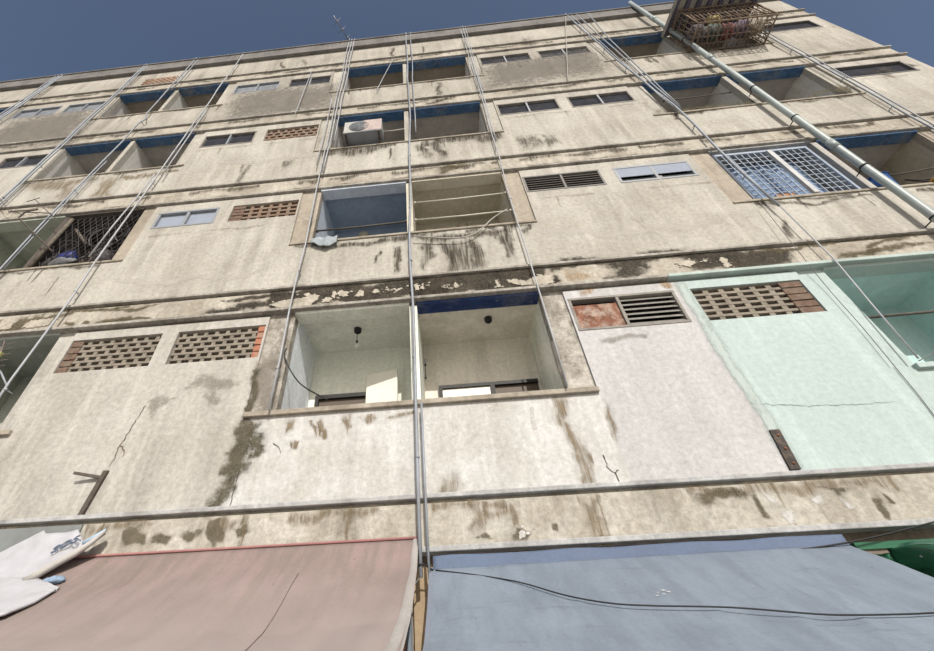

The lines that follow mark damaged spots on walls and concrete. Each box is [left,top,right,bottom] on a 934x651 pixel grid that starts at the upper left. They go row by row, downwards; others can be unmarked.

peeling [269,282,463,308]
leakage [206,224,836,314]
peeling [494,274,555,288]
peeling [674,257,735,268]
crack [753,400,897,408]
crack [109,405,146,466]
leakage [208,357,279,507]
leakage [556,400,594,483]
leakage [464,500,518,524]
leakage [587,497,607,546]
leakage [691,476,899,518]